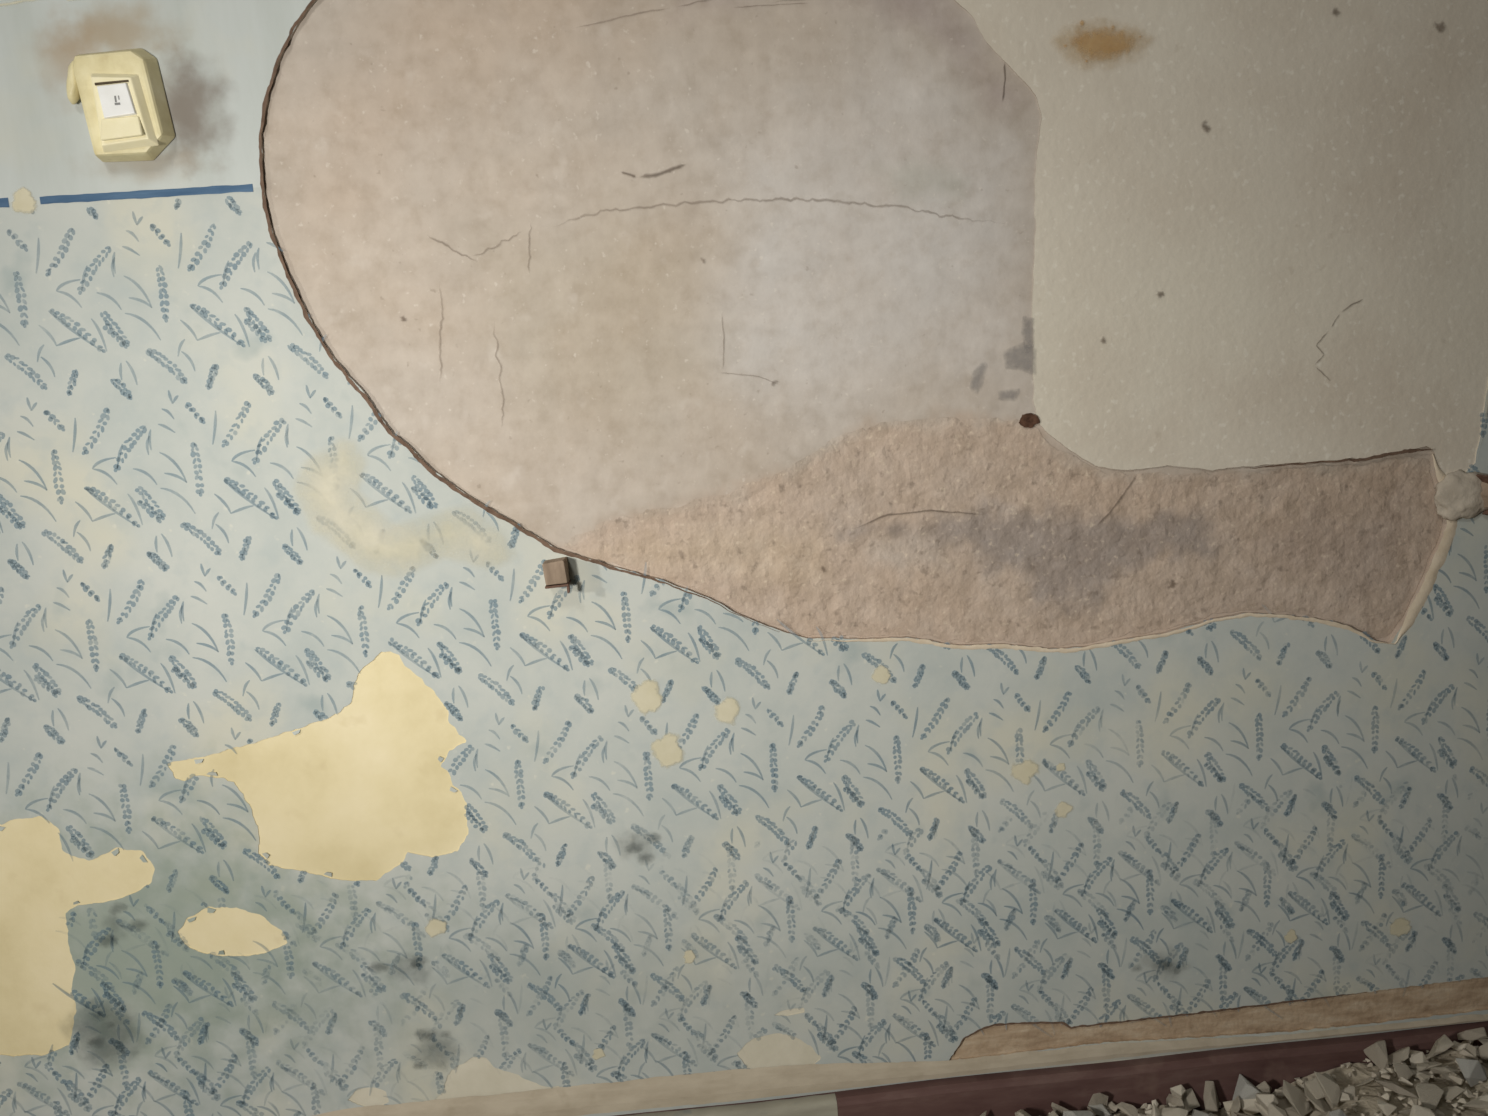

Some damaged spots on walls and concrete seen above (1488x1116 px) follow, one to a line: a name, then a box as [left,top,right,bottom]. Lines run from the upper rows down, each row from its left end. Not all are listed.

spalling [259,0,1488,653]
peeling [167,651,468,881]
peeling [0,816,155,1057]
peeling [178,906,287,956]
spalling [949,977,1488,1060]